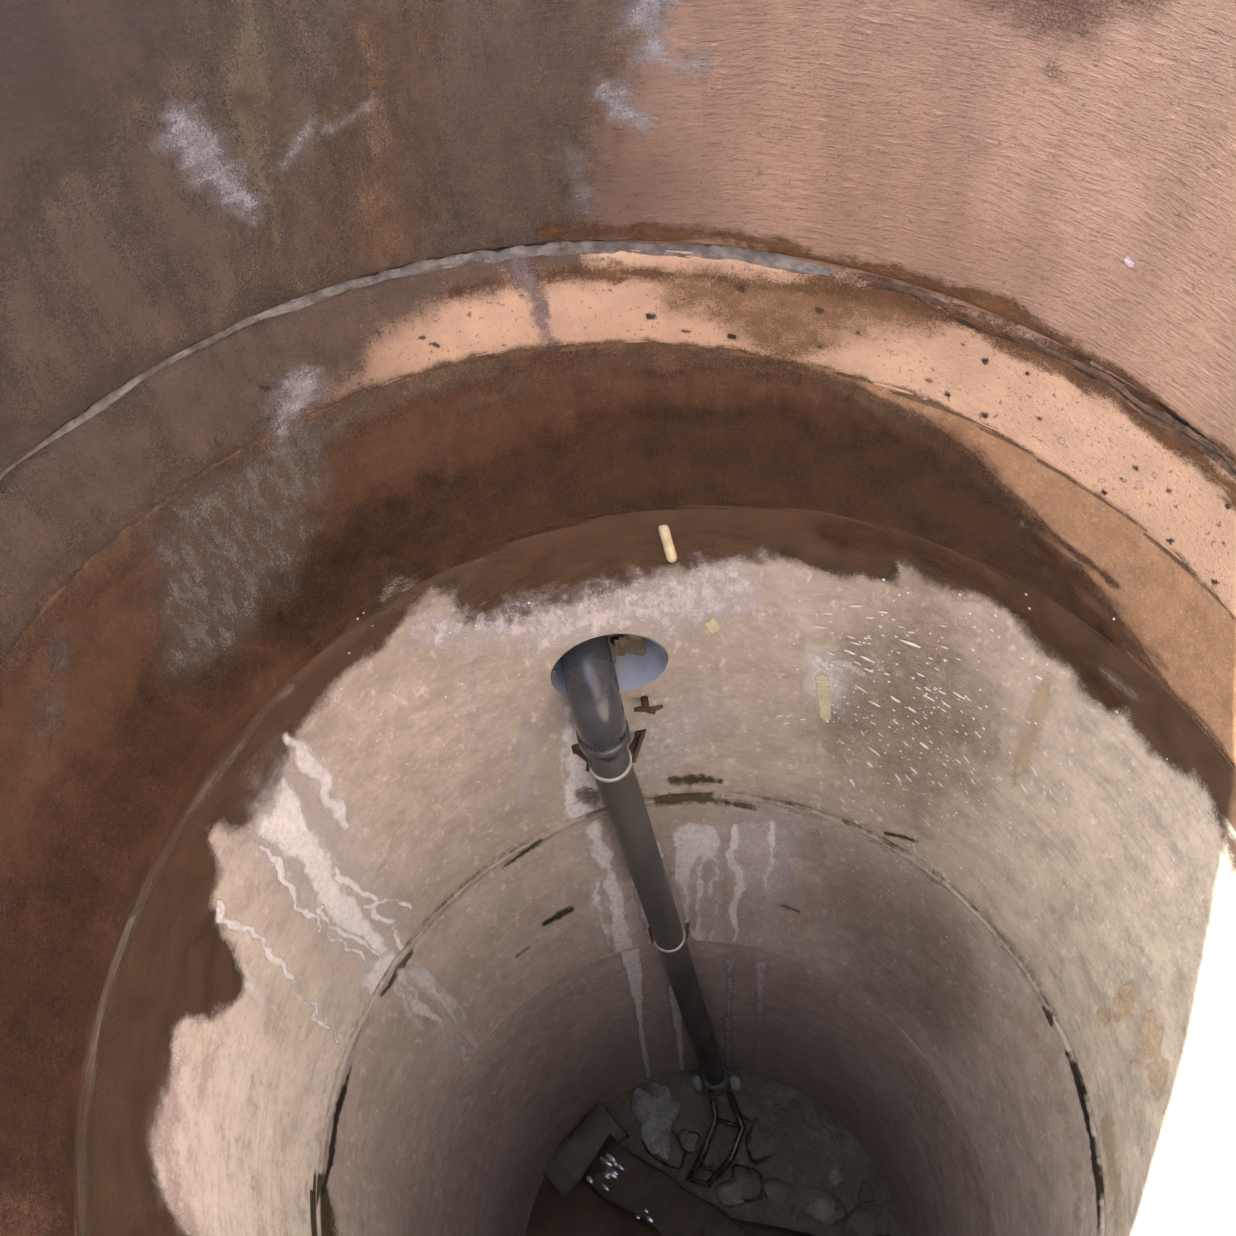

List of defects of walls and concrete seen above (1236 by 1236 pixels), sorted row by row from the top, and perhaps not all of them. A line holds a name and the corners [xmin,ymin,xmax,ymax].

damp [0,0,667,460]
damp [992,0,1157,37]
damp [0,253,1236,1236]